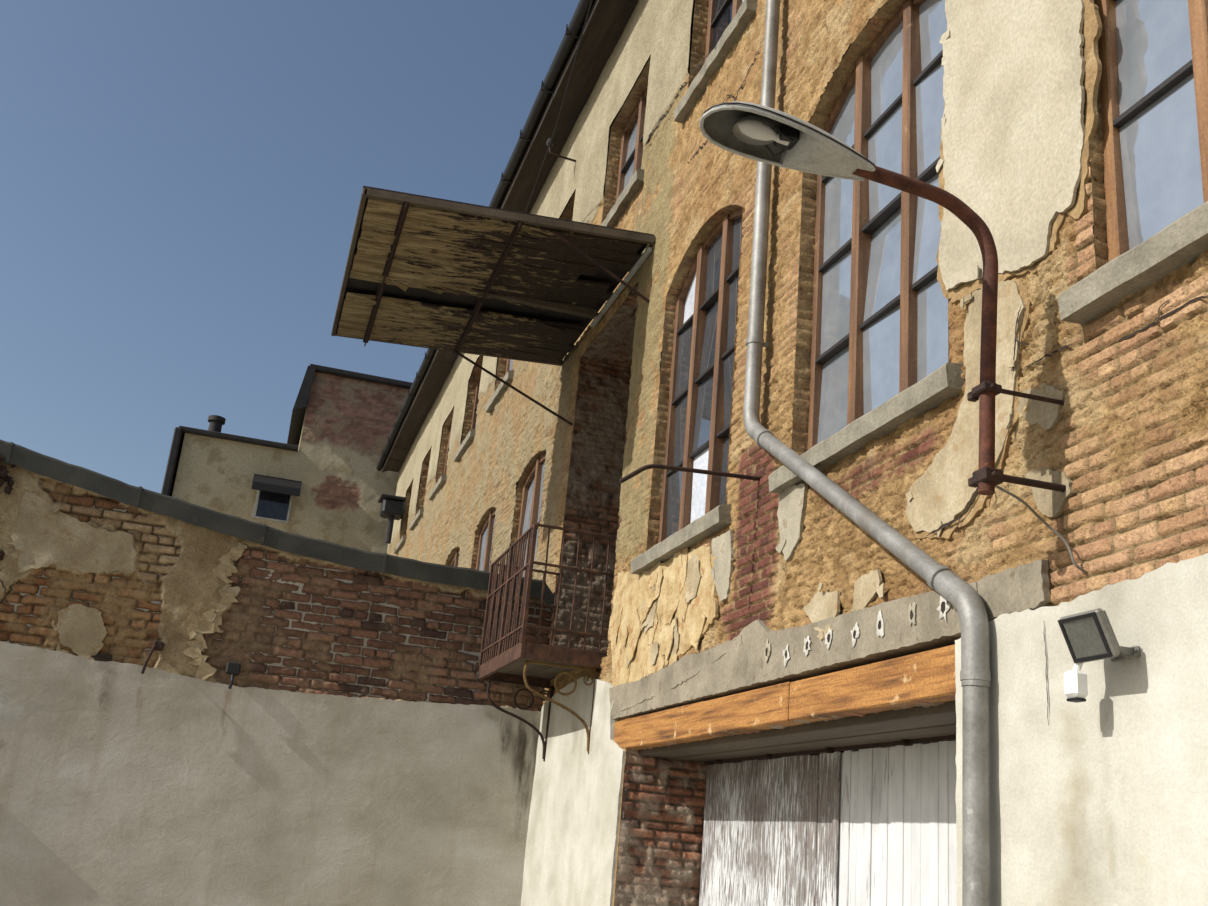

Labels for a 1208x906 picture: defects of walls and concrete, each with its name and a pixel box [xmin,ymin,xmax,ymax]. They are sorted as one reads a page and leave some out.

flaking render [936,0,1102,470]
flaking render [836,204,990,540]
flaking render [0,478,181,668]
flaking render [182,541,552,711]
water stain [508,725,539,774]
flaking render [608,446,885,687]
crack [1042,626,1050,726]